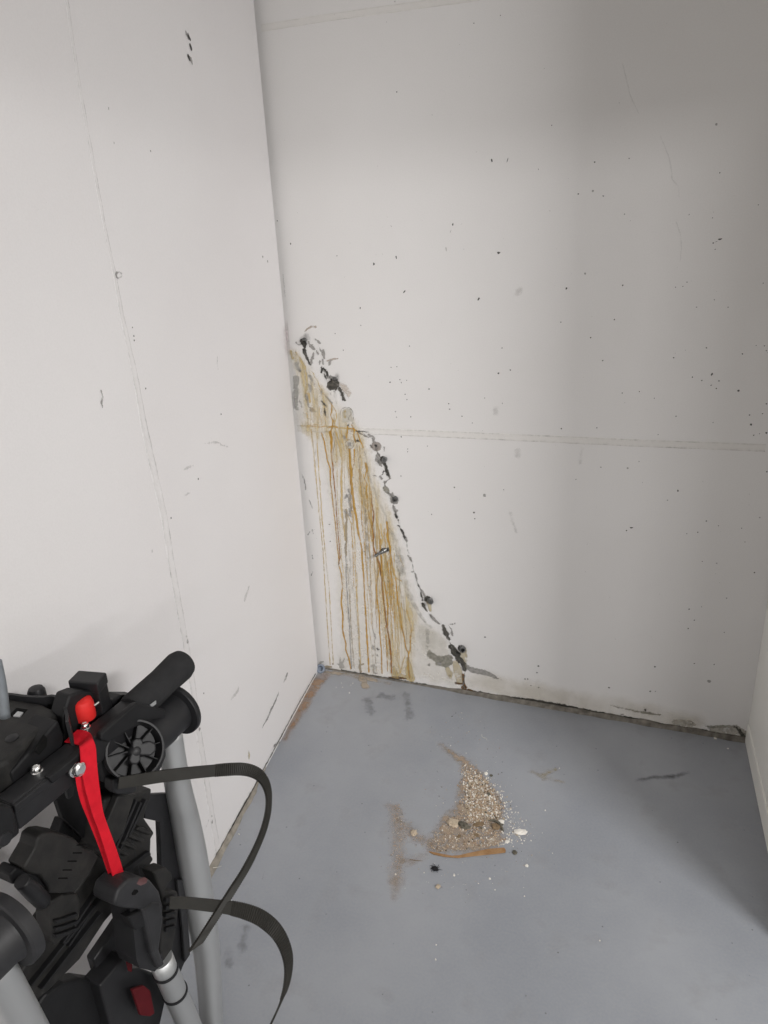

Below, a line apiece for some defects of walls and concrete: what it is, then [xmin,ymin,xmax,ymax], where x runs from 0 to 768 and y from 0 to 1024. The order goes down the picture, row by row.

corrosion [290,351,415,728]
crack [300,339,718,733]